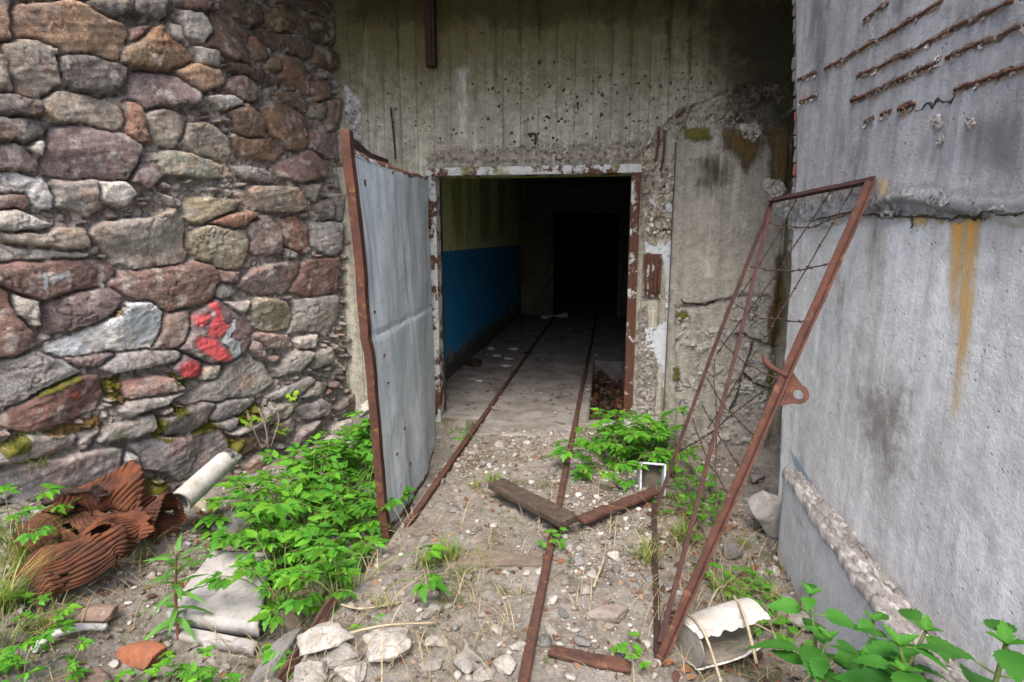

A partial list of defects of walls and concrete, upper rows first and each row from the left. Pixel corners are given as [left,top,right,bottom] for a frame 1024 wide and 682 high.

damp [703,0,796,155]
crack [915,93,956,112]
spalling [849,0,1024,106]
spalling [415,0,945,449]
crack [811,209,1024,228]
crack [681,298,721,306]
corrosion [940,214,980,375]